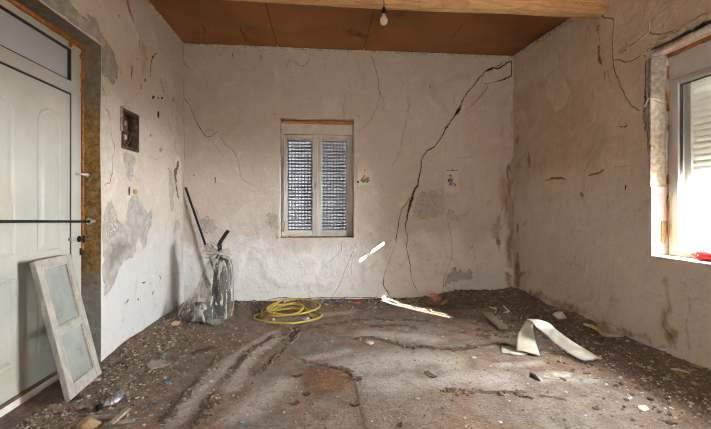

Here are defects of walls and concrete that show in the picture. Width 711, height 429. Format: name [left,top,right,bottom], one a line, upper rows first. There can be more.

flaking render [41,0,153,301]
crack [184,97,252,185]
crack [268,55,512,300]
crack [597,14,711,155]
flaking render [444,265,474,288]